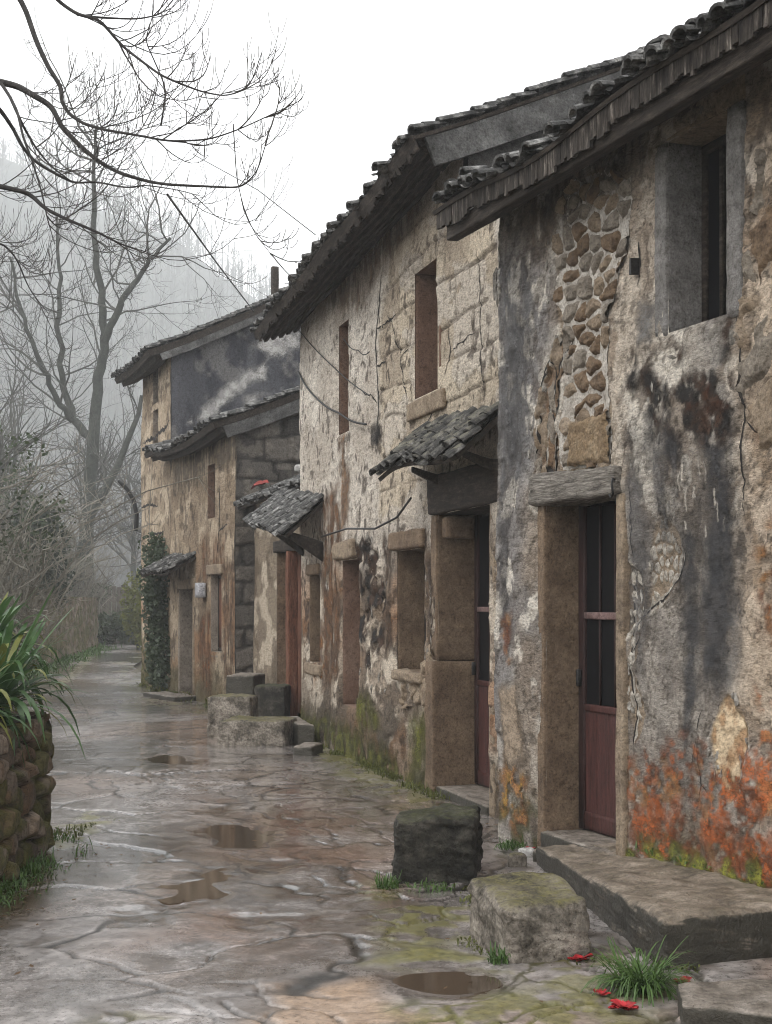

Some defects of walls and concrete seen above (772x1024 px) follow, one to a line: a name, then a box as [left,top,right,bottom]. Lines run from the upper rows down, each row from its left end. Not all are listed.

crack [363,268,408,424]
crack [440,242,484,395]
peeling [492,246,502,307]
flaking render [527,168,633,474]
crack [736,317,758,515]
leakage [626,302,740,734]
crack [628,486,686,750]
rust [759,571,772,631]
rust [500,764,527,833]
rust [628,730,772,889]
flaking render [706,692,749,809]